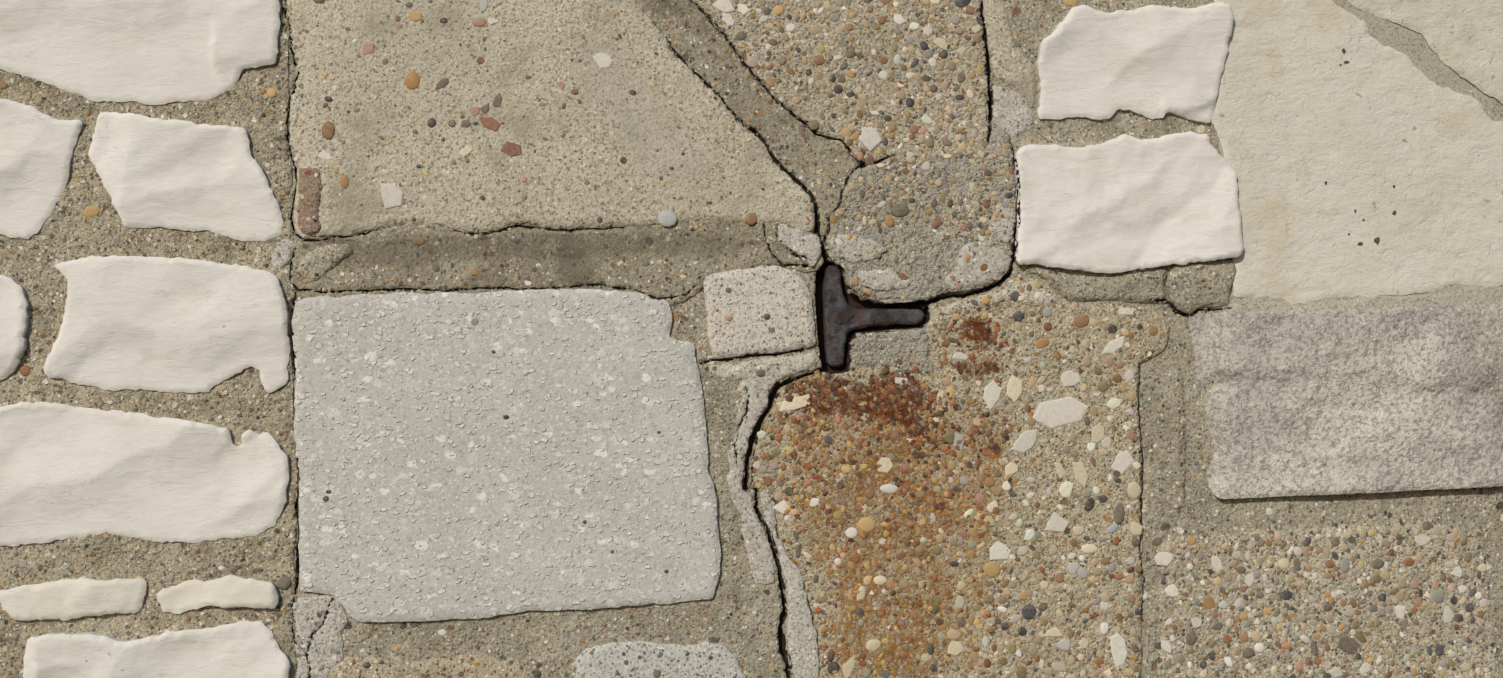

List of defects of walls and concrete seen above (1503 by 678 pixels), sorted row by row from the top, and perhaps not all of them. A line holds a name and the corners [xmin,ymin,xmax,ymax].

crack [667,2,893,267]
crack [919,1,1021,309]
crack [700,349,822,678]
corrosion [759,307,1021,678]